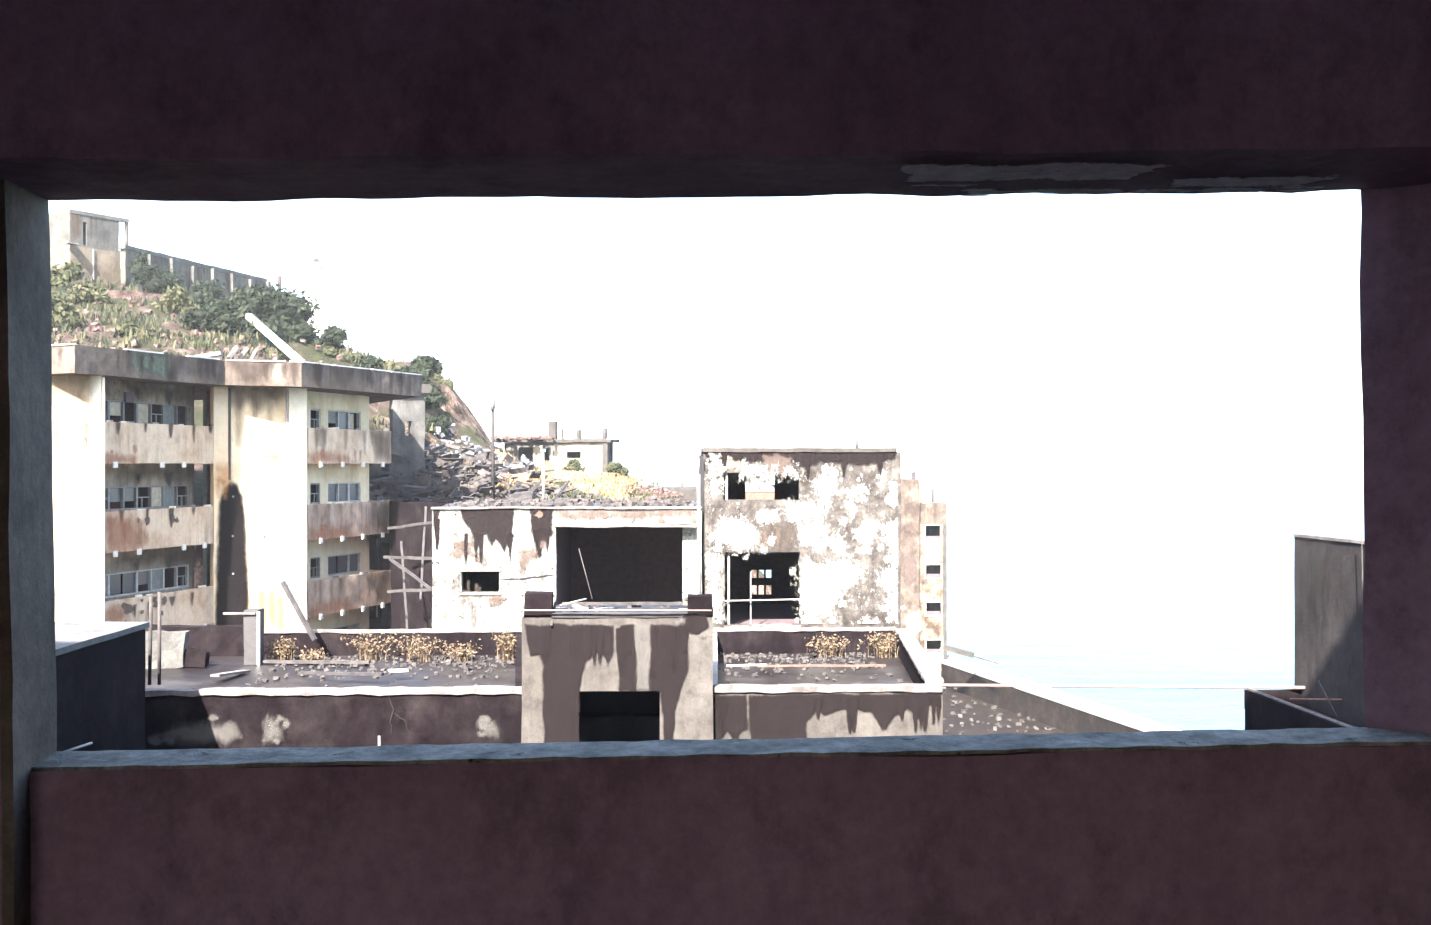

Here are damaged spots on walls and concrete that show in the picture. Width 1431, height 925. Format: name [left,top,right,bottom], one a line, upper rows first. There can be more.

rust [106,445,137,466]
rust [106,516,147,552]
water stain [432,509,440,549]
peeling [450,540,480,562]
water stain [453,506,553,629]
peeling [518,541,547,575]
peeling [535,452,925,637]
peeling [919,534,943,570]
peeling [479,595,506,608]
water stain [524,623,689,743]
water stain [713,692,941,740]